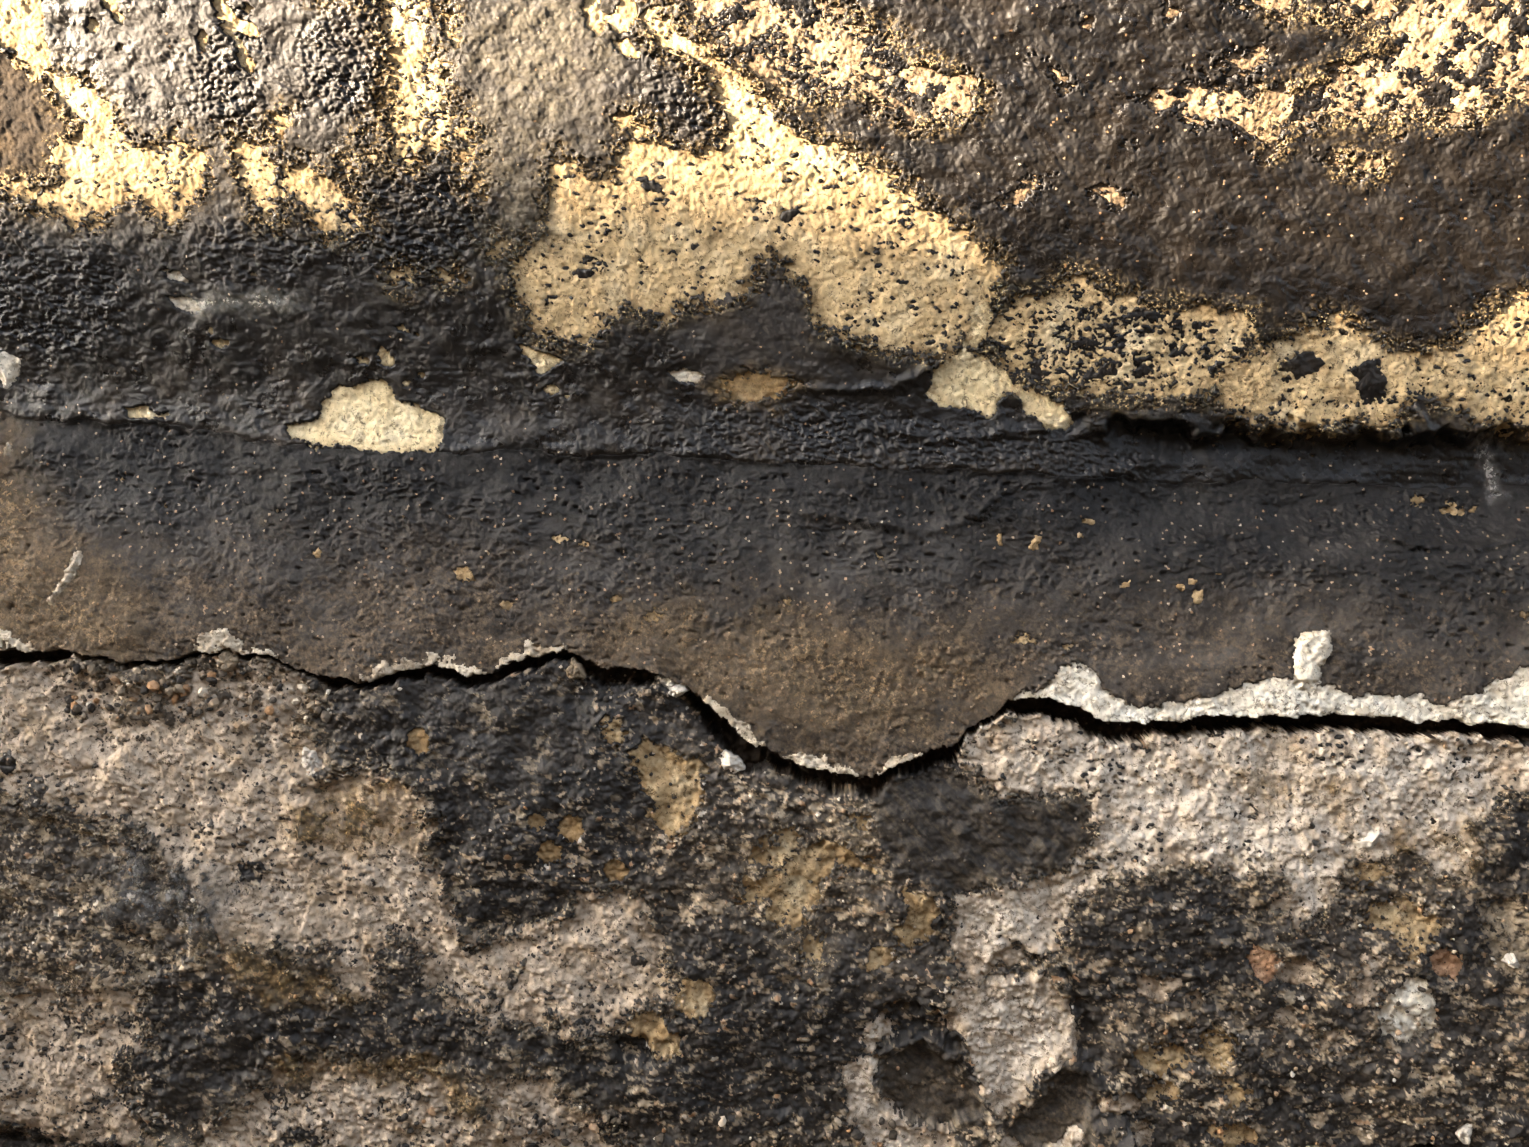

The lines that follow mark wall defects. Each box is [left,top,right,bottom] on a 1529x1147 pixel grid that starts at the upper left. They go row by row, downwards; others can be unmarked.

peeling [0,0,501,249]
peeling [382,247,471,304]
peeling [482,0,1529,457]
peeling [287,346,445,454]
spalling [453,566,476,583]
spalling [552,534,589,552]
crack [0,628,1529,799]
spalling [865,630,1529,1147]